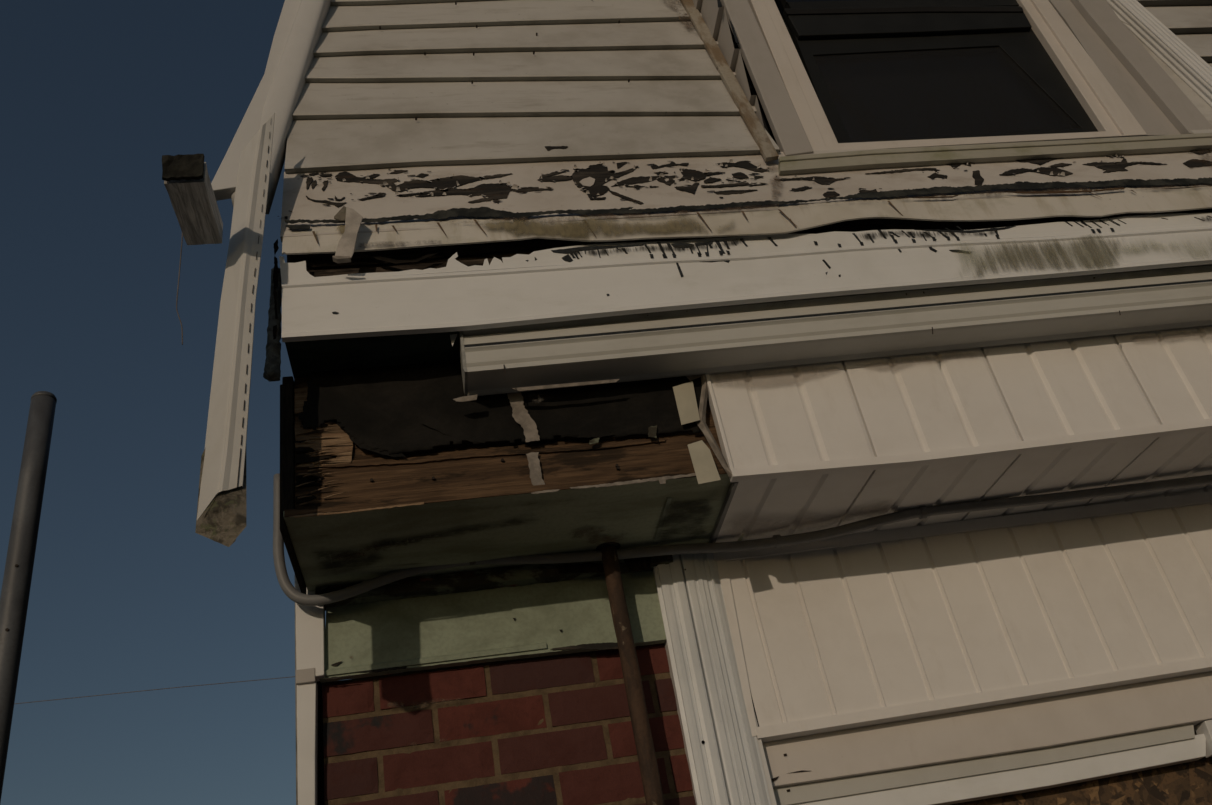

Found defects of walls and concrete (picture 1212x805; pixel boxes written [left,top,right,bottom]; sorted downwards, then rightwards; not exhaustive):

peeling [999,154,1167,176]
peeling [1183,150,1212,168]
peeling [300,159,984,207]
damp [852,218,1127,274]
peeling [531,473,696,494]